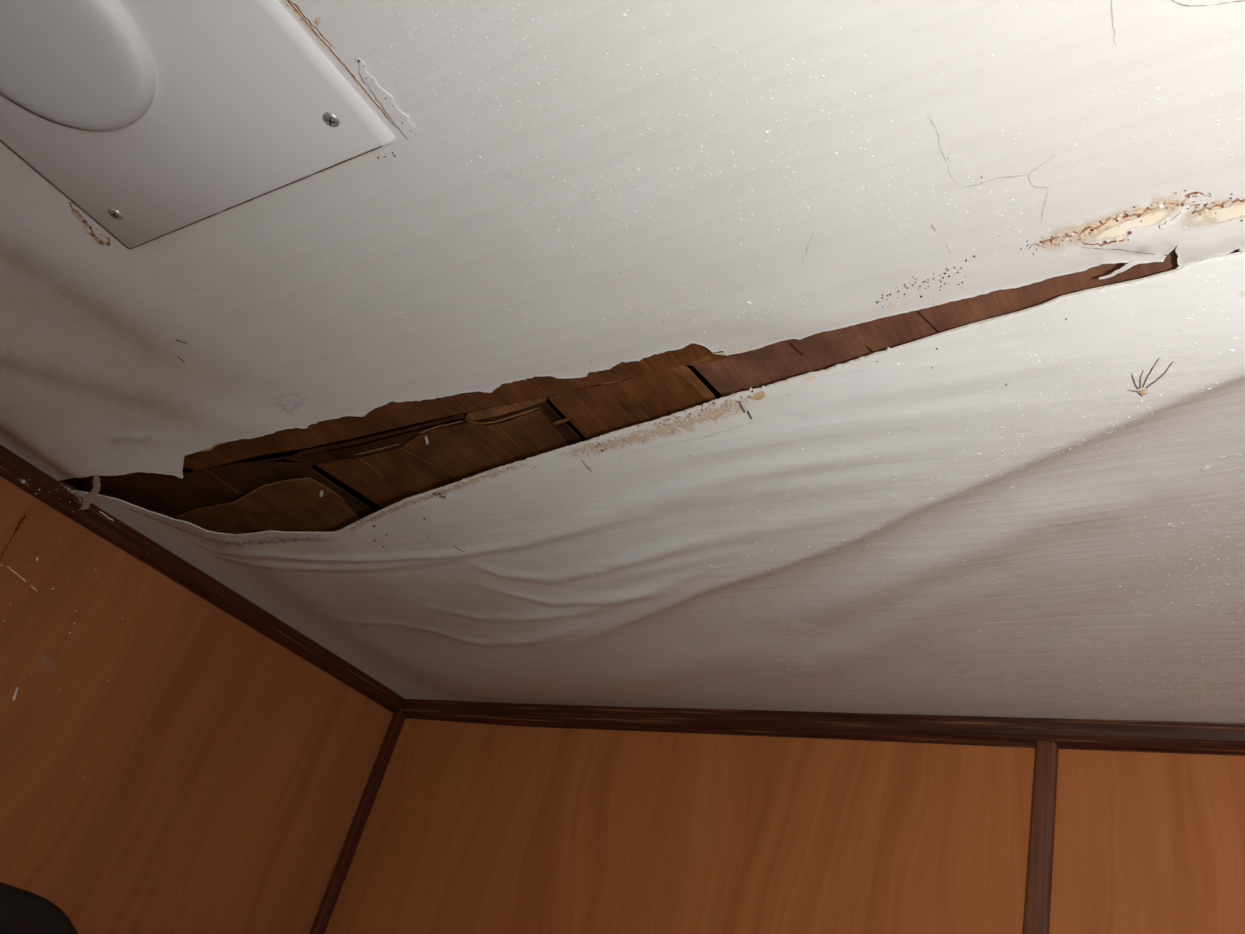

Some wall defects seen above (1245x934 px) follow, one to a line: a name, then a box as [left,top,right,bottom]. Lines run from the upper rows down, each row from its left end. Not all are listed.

peeling [1026,190,1245,275]